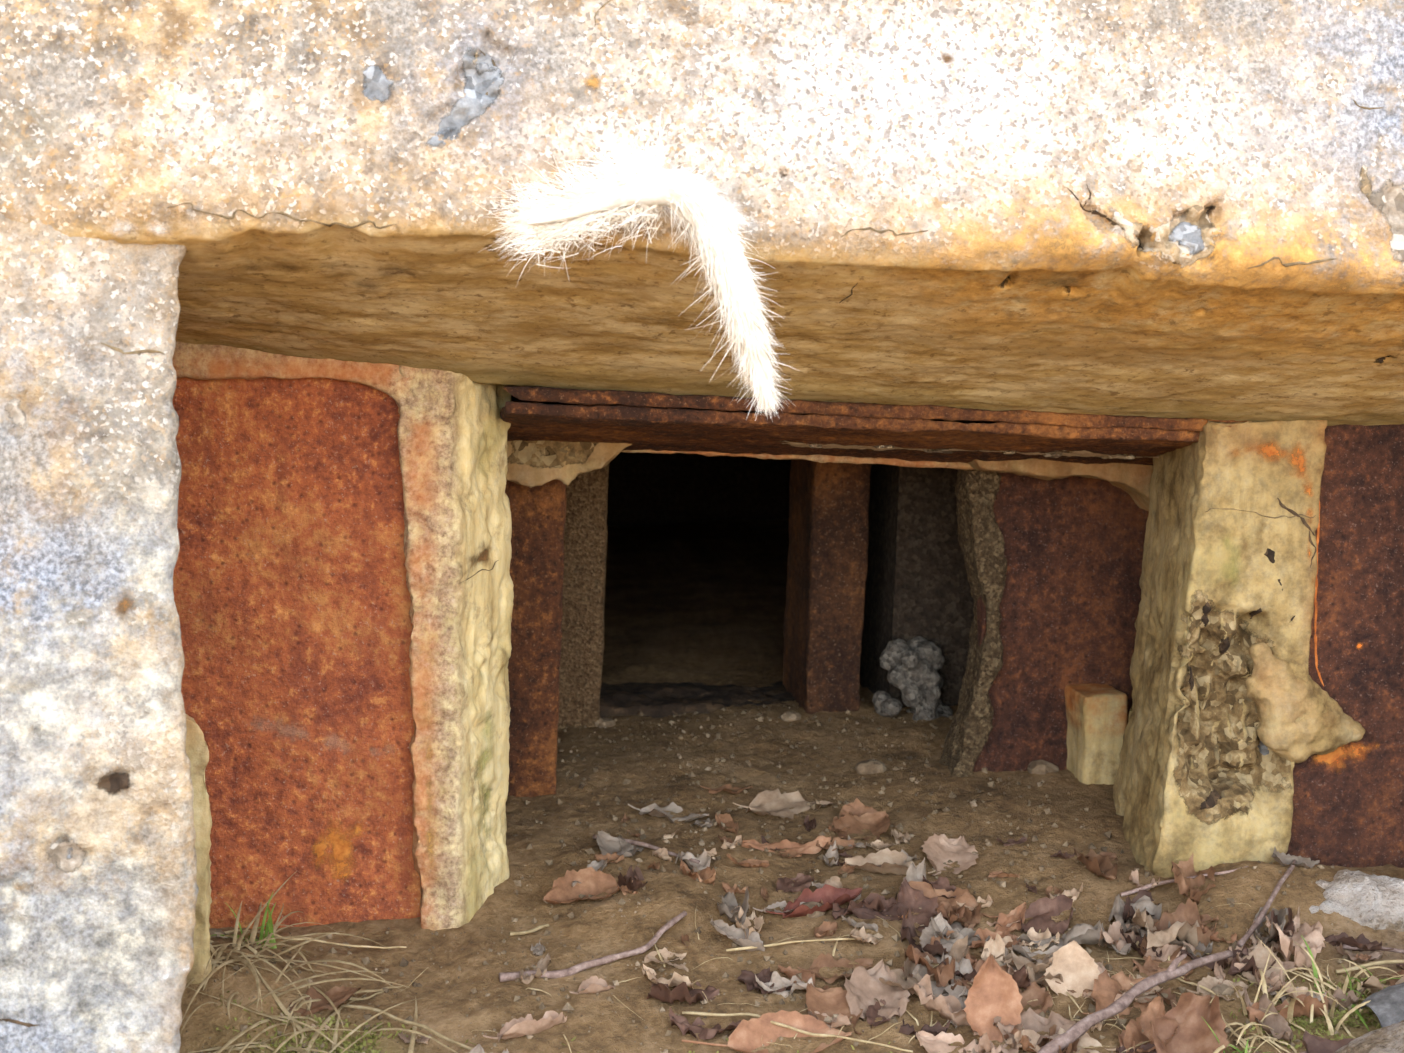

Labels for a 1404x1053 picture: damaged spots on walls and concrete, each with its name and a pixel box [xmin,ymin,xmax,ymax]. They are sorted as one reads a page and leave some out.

spalling [1109,205,1222,268]
spalling [1359,165,1404,262]
spalling [1173,590,1291,825]
rust [1314,745,1369,767]
rust [313,826,361,878]